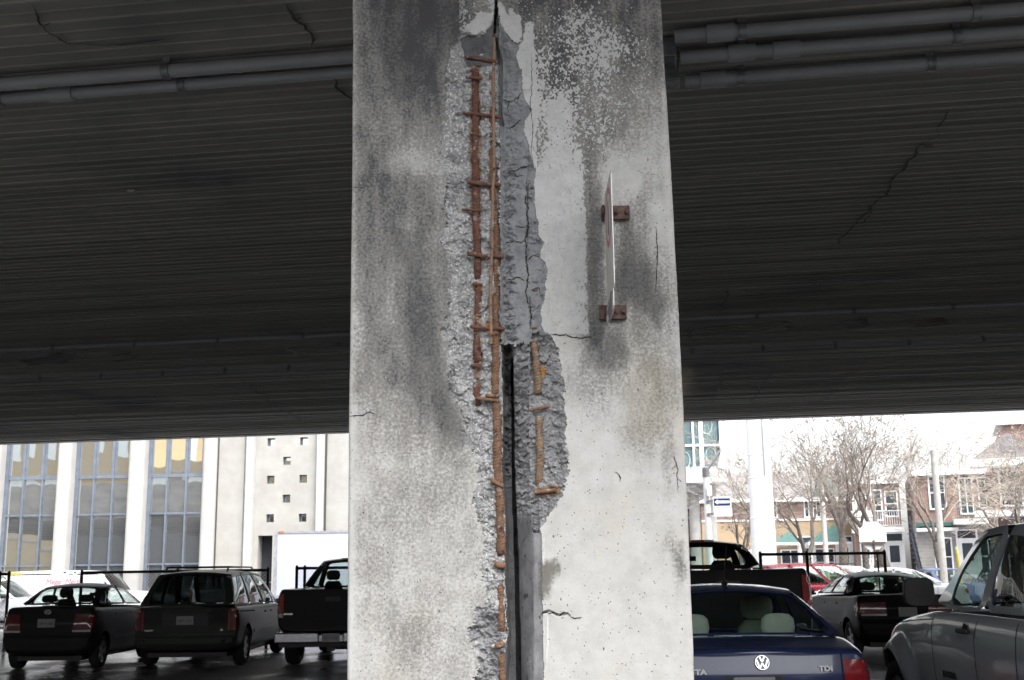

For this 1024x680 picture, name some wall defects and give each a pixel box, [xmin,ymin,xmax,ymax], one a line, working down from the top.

crack [32,5,175,46]
crack [286,4,315,47]
crack [492,0,500,34]
crack [829,111,948,248]
spalling [431,0,664,680]
crack [539,611,581,619]